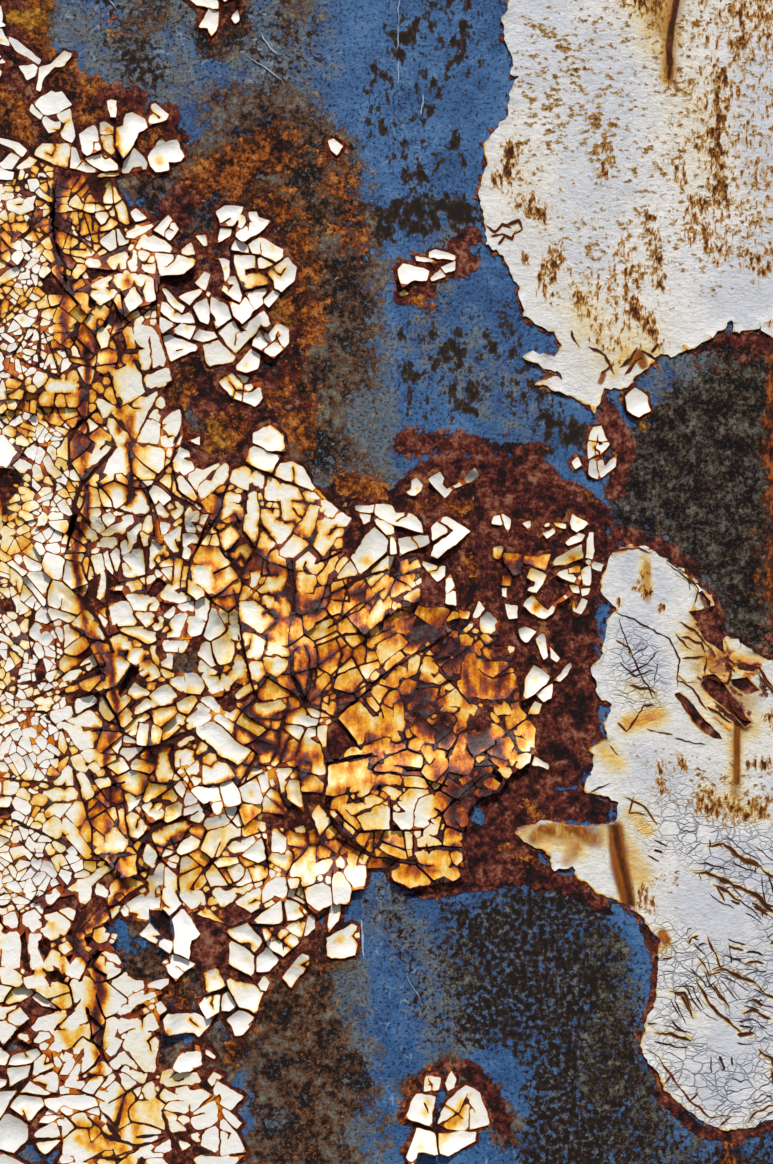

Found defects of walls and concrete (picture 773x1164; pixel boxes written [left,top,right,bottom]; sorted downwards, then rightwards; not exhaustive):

peeling [190,0,240,36]
peeling [478,0,773,480]
corrosion [130,513,236,617]
crack [0,164,481,980]
corrosion [214,486,297,603]
peeling [0,6,572,1164]
crack [611,547,773,755]
corrosion [58,781,134,838]
peeling [493,514,773,1131]
corrosion [0,973,131,1164]
crack [58,1010,179,1164]
crack [647,835,773,1132]